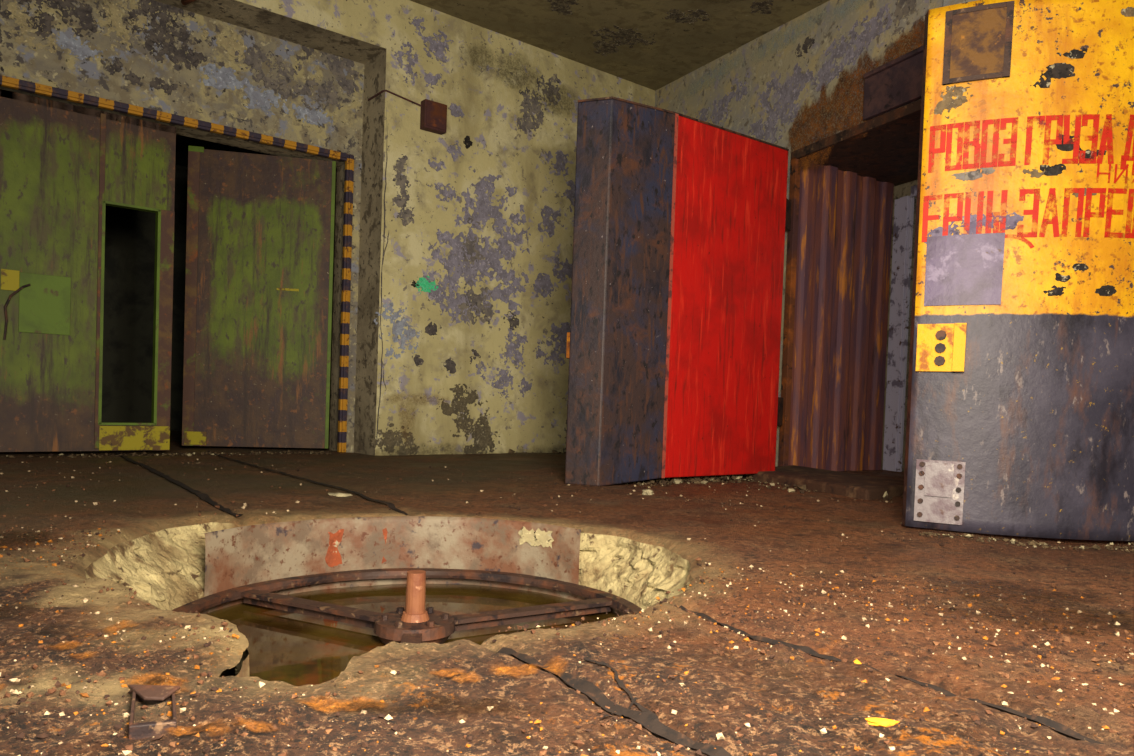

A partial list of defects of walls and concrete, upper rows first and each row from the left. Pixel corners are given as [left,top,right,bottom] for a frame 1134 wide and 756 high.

peeling [0,0,364,126]
peeling [394,16,454,87]
peeling [514,75,563,137]
rust [789,19,925,171]
peeling [371,136,575,455]
spalling [85,522,239,610]
peeling [518,526,554,548]
spalling [579,533,694,610]
spalling [219,649,249,677]
crack [583,655,673,741]